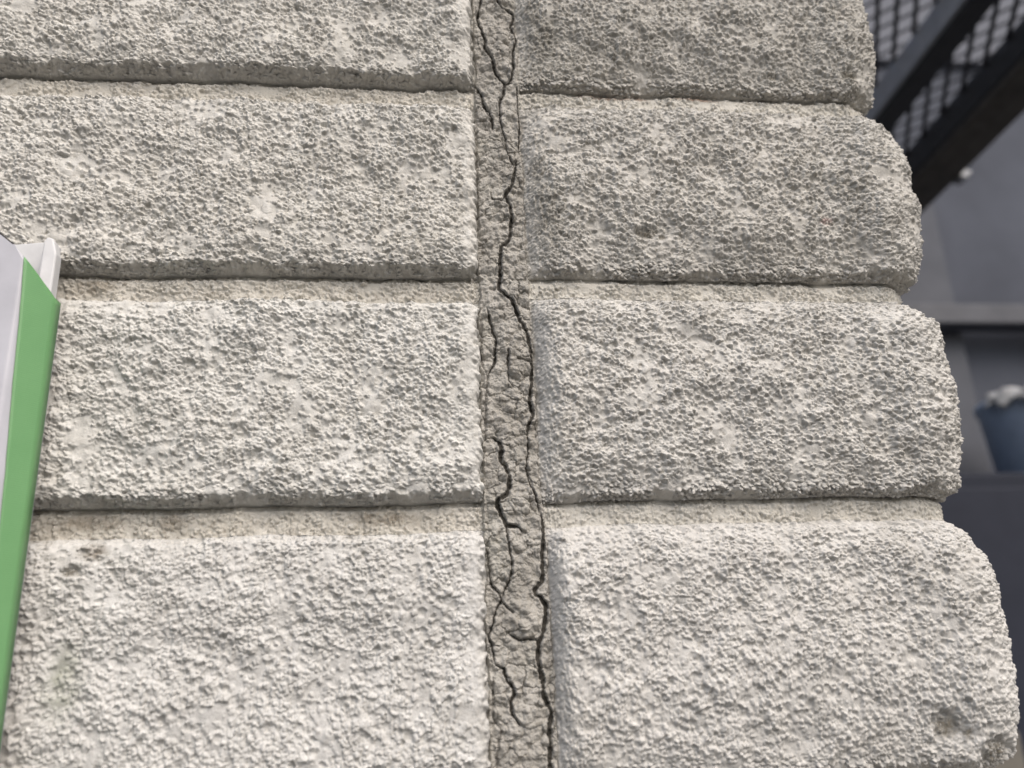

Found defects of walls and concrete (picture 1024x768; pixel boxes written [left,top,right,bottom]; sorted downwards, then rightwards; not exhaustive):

crack [463,0,553,768]